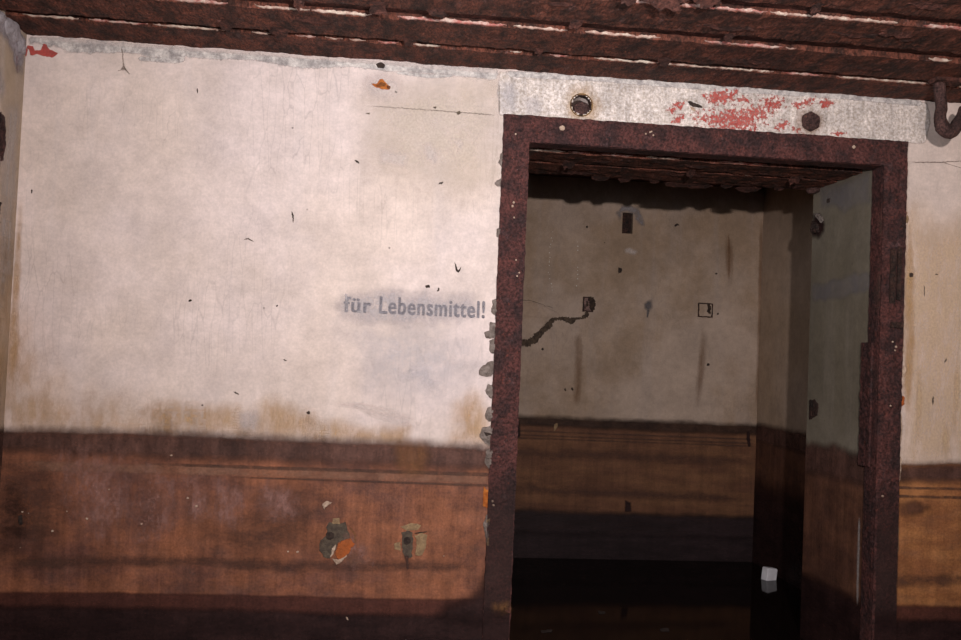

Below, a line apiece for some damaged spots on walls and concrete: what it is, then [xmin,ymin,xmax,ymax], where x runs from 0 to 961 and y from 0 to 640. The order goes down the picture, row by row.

corrosion [621,0,722,12]
peeling [0,11,930,144]
corrosion [810,213,824,237]
flaking render [479,299,497,469]
corrosion [809,399,819,419]
damp [0,430,490,640]
flaking render [319,518,355,565]
flaking render [394,523,427,569]
damp [896,464,961,640]